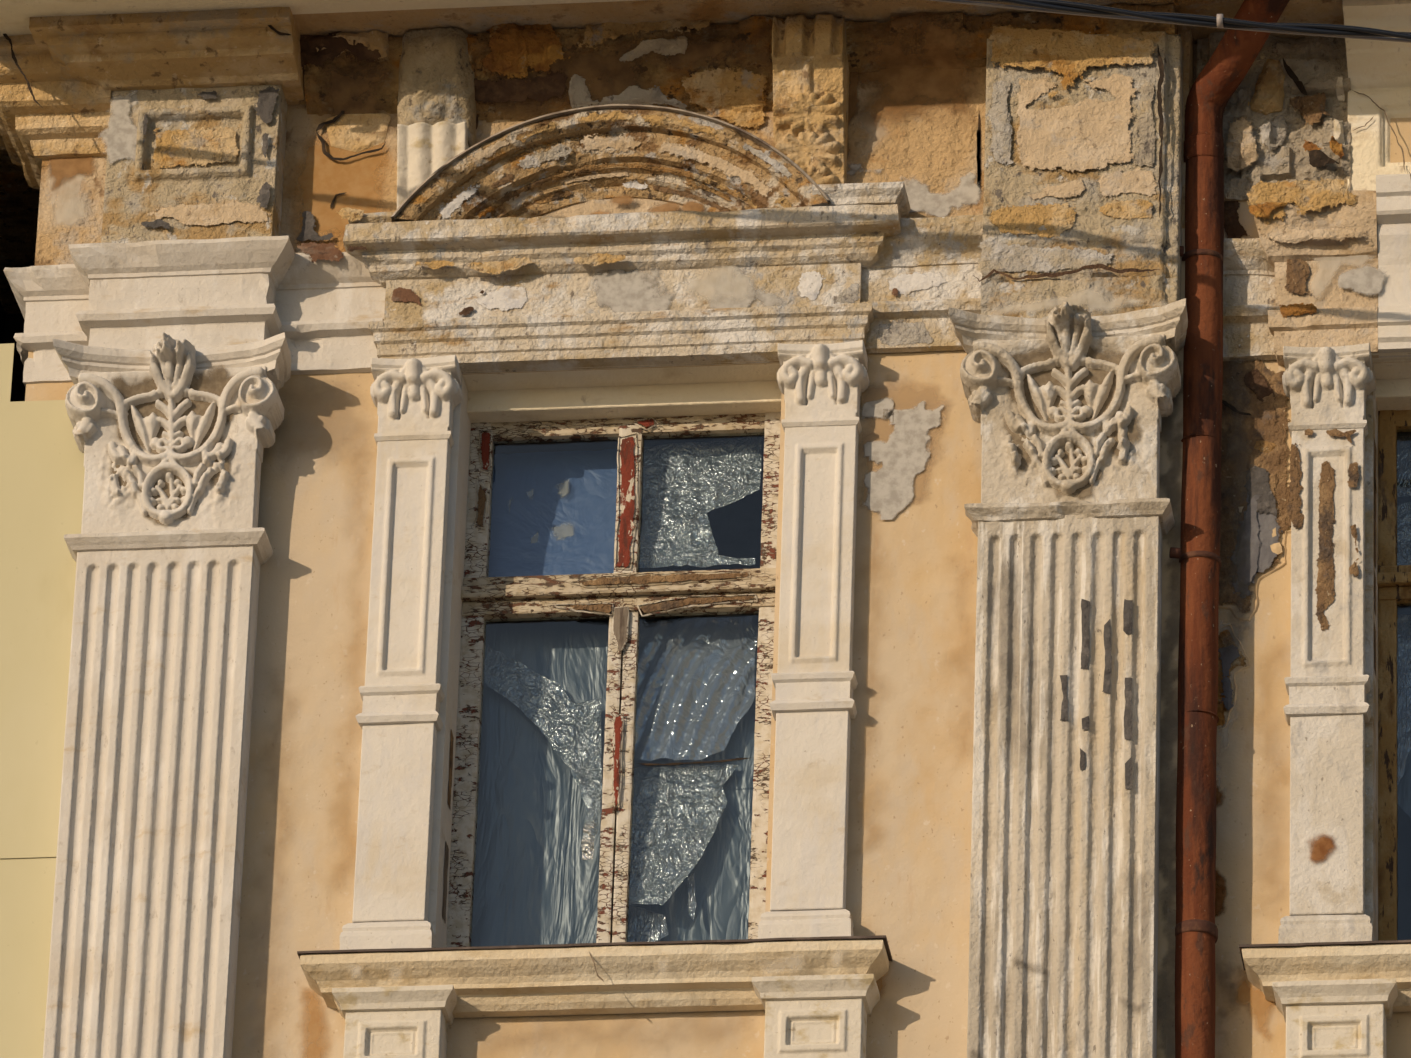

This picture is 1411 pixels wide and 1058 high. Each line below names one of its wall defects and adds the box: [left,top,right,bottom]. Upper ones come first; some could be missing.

crack [3,34,41,106]
flaking render [845,4,1178,98]
flaking render [439,16,792,219]
flaking render [989,168,1158,238]
flaking render [1223,35,1368,318]
crack [1353,91,1411,177]
peeling [415,256,532,316]
peeling [574,253,673,312]
peeling [862,398,944,520]
flaking render [1217,360,1376,731]
rust [1310,835,1335,862]
rust [1215,871,1226,916]